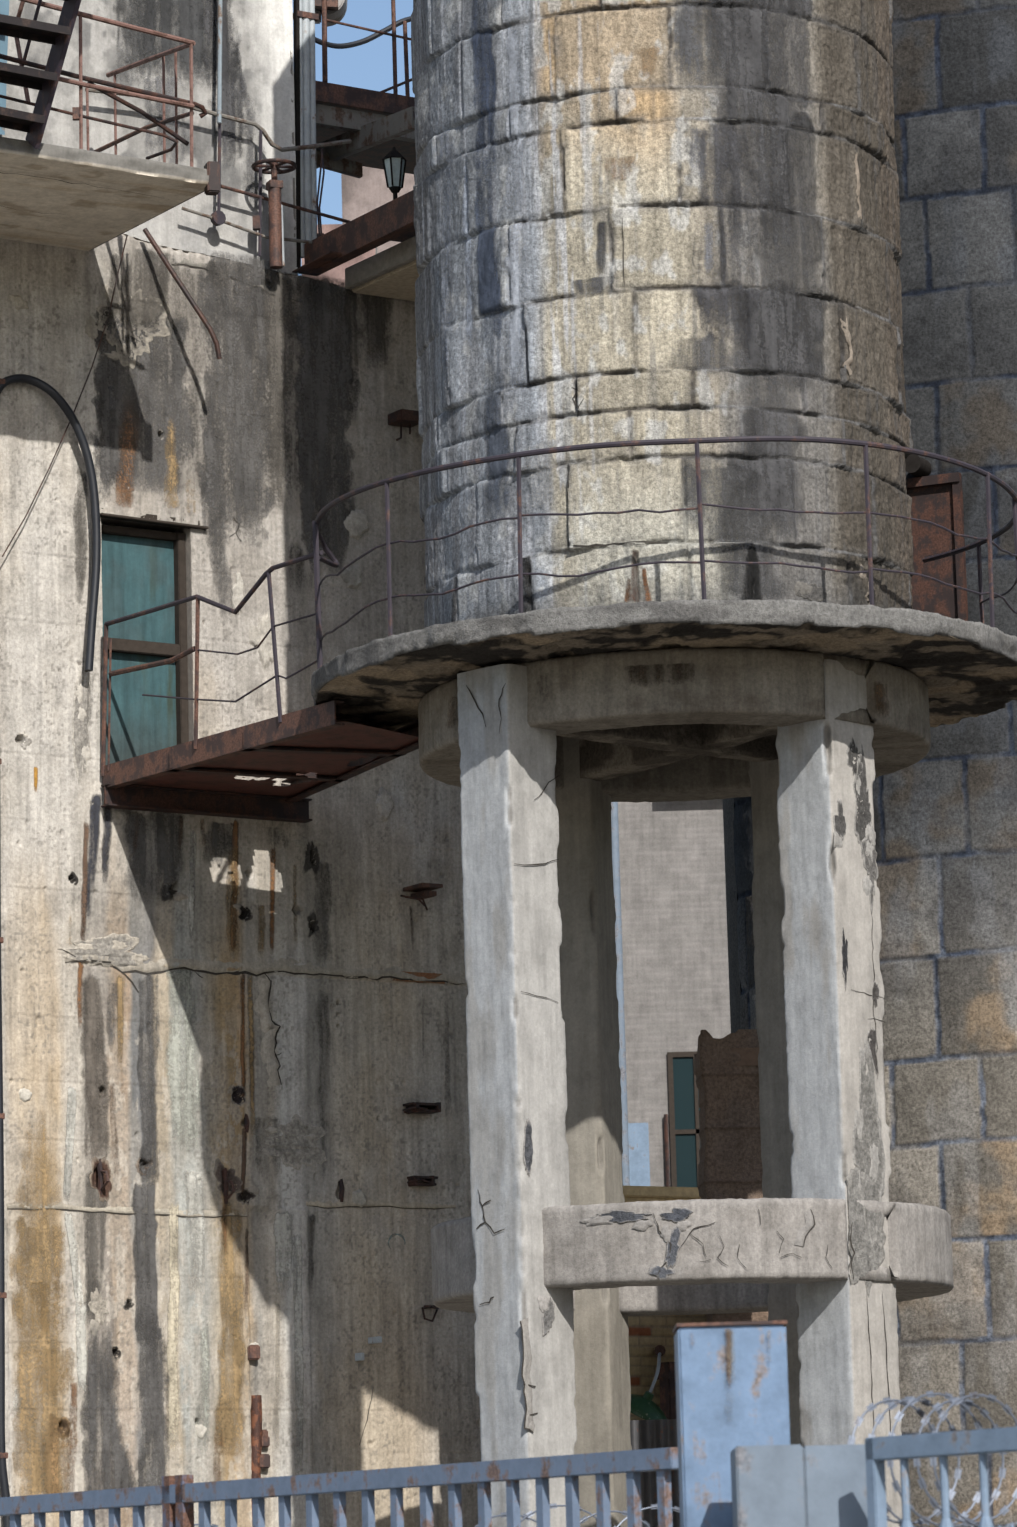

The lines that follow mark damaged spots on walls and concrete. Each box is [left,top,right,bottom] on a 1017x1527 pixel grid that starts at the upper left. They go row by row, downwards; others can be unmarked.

water stain [673,0,826,600]
corrosion [116,410,137,506]
water stain [74,249,391,612]
crack [466,683,506,732]
spalling [63,933,149,969]
corrosion [226,820,239,949]
crack [62,949,464,1087]
spalling [833,737,878,915]
corrosion [214,974,255,1454]
crack [306,1189,504,1234]
corrosion [10,1125,77,1496]
crack [653,1209,891,1433]